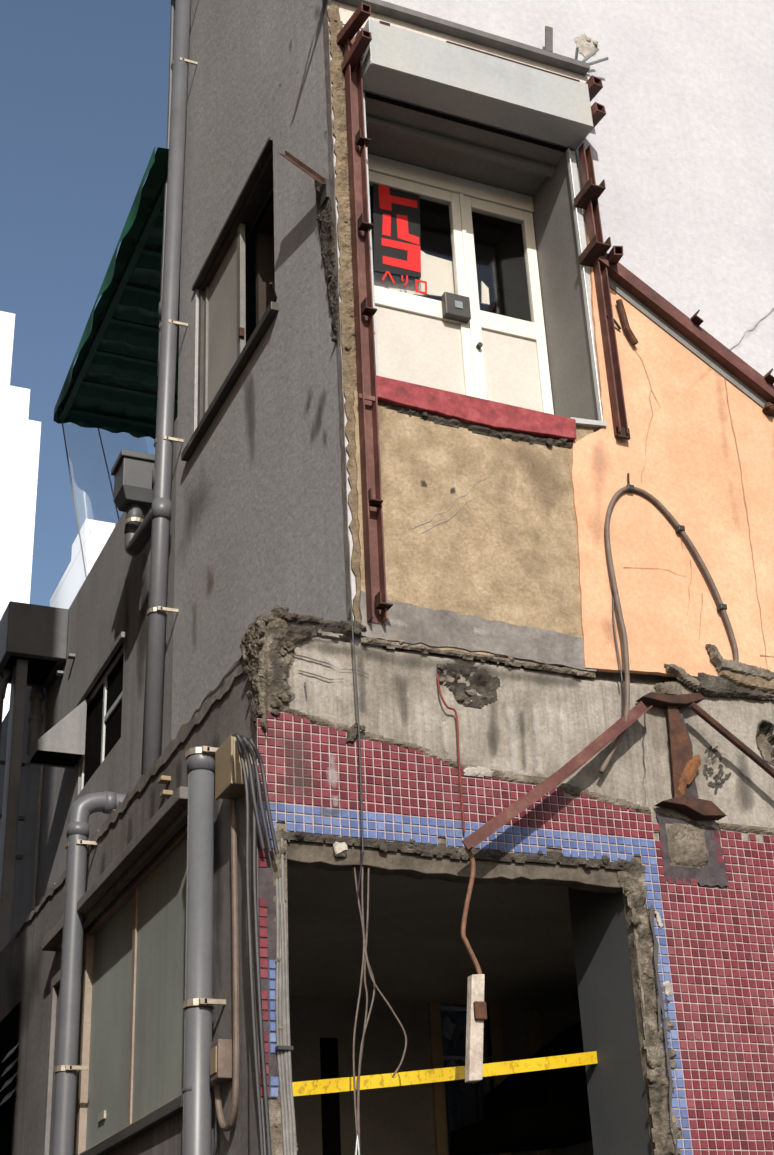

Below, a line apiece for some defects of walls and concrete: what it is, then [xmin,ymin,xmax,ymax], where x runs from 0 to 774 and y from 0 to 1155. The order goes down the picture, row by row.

flaking render [315,19,358,390]
crack [729,308,774,350]
crack [724,378,774,670]
flaking render [654,644,774,700]
spalling [240,605,651,814]
spalling [643,966,672,1013]
peeling [646,1024,677,1083]